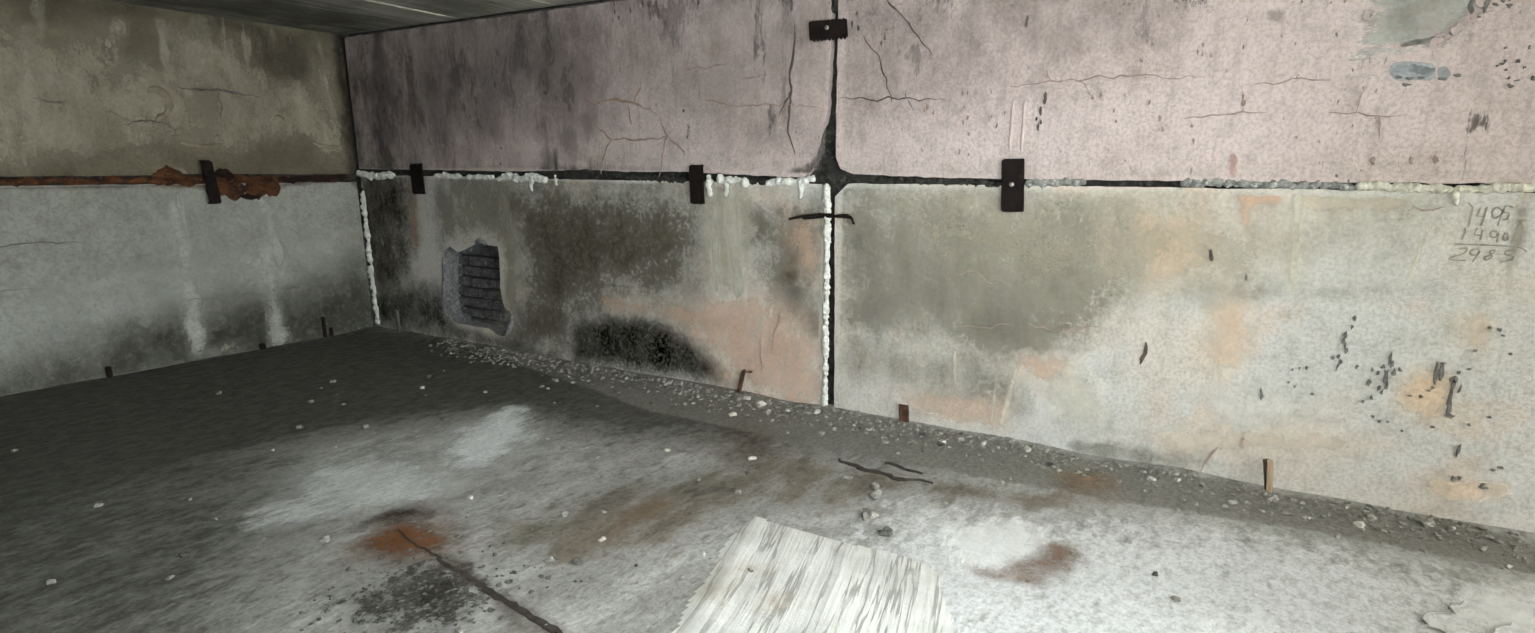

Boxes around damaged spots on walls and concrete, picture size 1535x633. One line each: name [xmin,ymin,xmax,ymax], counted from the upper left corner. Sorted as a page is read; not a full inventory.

crack [584,77,686,177]
water stain [641,0,698,48]
crack [684,25,945,154]
crack [887,0,932,55]
crack [1010,68,1194,98]
crack [1184,77,1405,139]
peeling [1351,0,1513,87]
rust [0,165,348,201]
water stain [0,0,822,396]
spalling [442,238,514,336]
water stain [843,189,1253,424]
water stain [246,405,537,530]